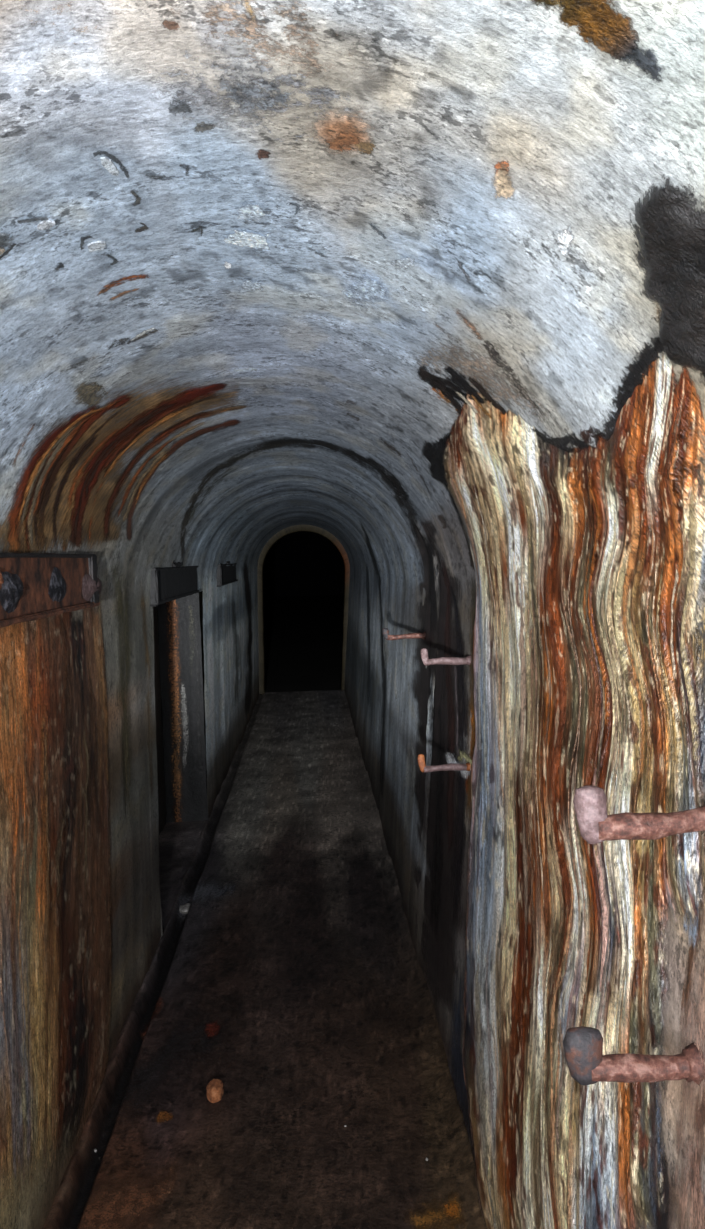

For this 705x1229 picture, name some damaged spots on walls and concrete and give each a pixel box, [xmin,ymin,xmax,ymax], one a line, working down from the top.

water stain [149,0,352,142]
rust [0,379,251,553]
water stain [417,366,506,419]
water stain [483,340,545,416]
water stain [531,175,705,453]
water stain [696,611,705,694]
rust [410,311,705,1229]
rust [0,593,113,1208]